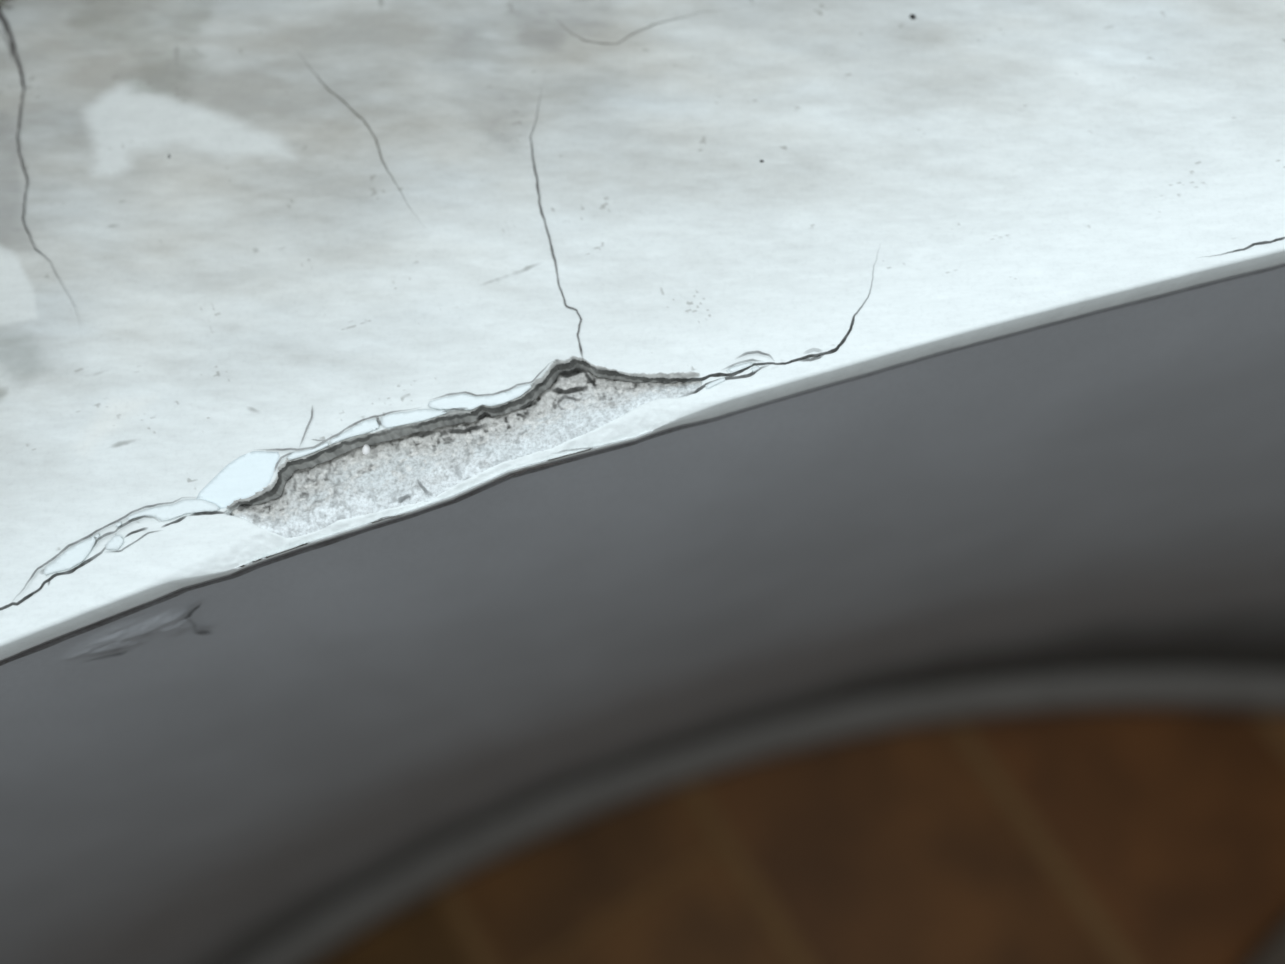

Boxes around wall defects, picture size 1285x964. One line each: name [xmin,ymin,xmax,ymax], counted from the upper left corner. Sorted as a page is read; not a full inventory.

crack [0,9,45,257]
crack [319,79,387,169]
crack [530,136,582,353]
crack [0,306,862,666]
flaking render [196,359,702,538]